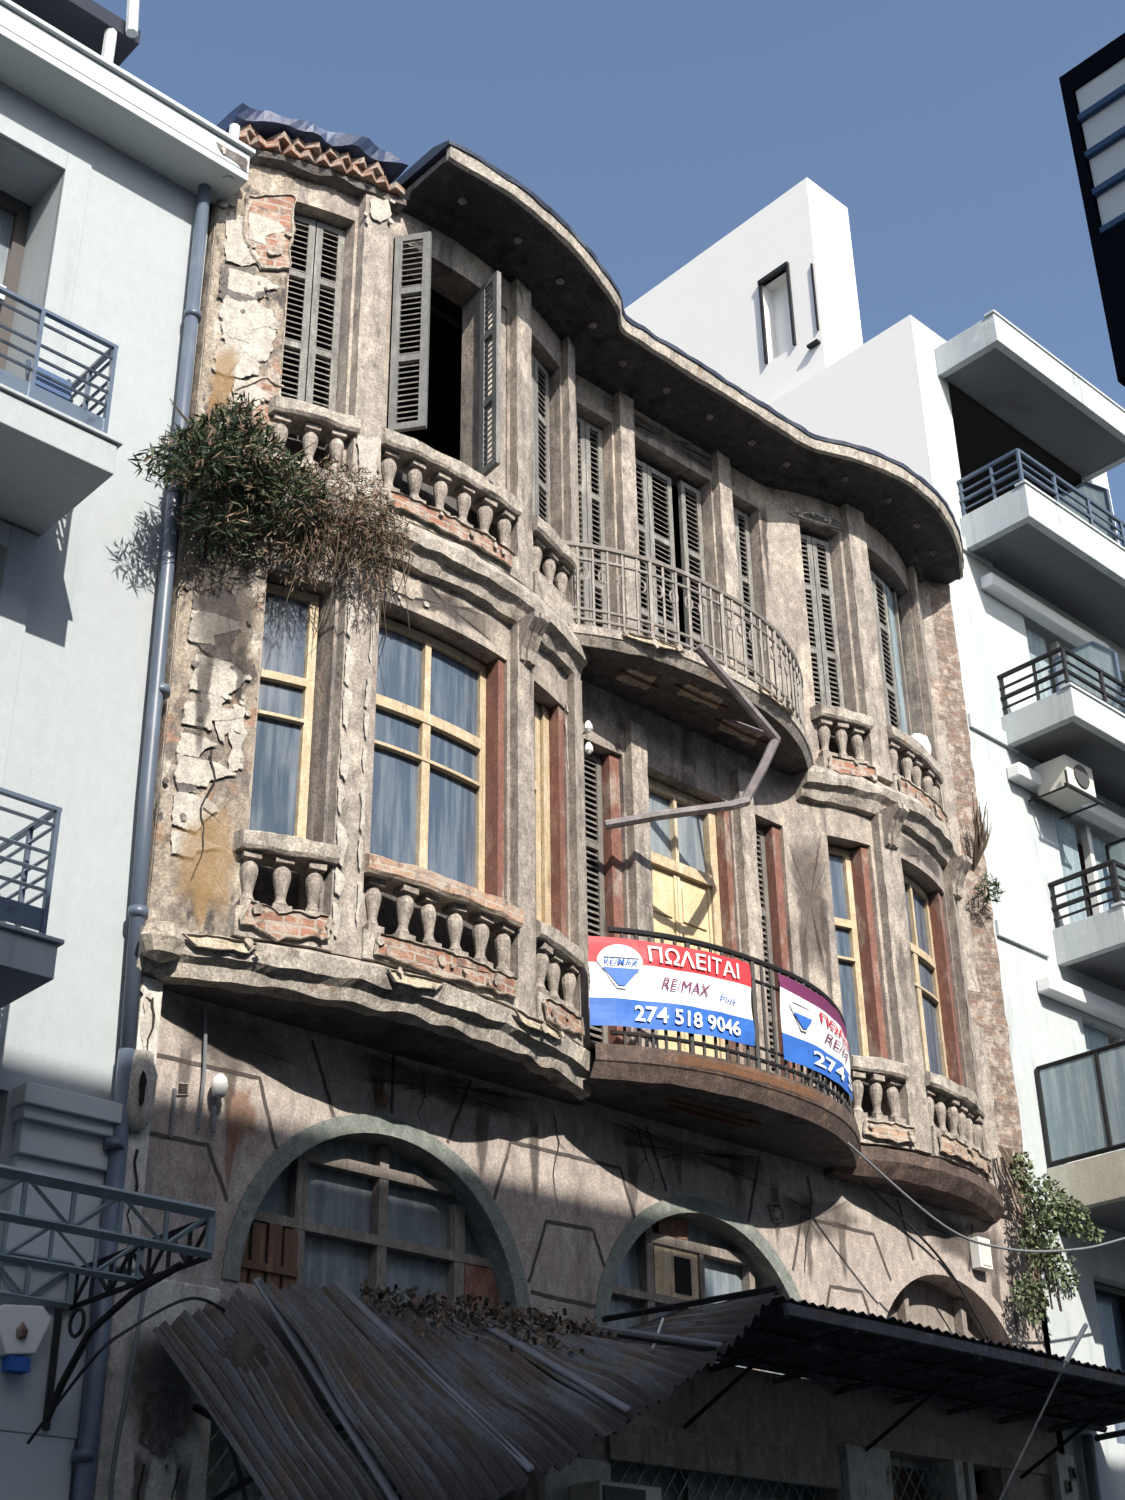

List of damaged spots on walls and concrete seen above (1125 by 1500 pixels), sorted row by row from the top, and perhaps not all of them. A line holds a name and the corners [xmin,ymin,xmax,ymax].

peeling [216,141,248,172]
peeling [212,193,297,441]
flaking render [356,427,517,569]
peeling [384,570,430,608]
peeling [163,584,253,858]
flaking render [182,566,374,957]
flaking render [374,933,585,1040]
water stain [176,1470,189,1500]